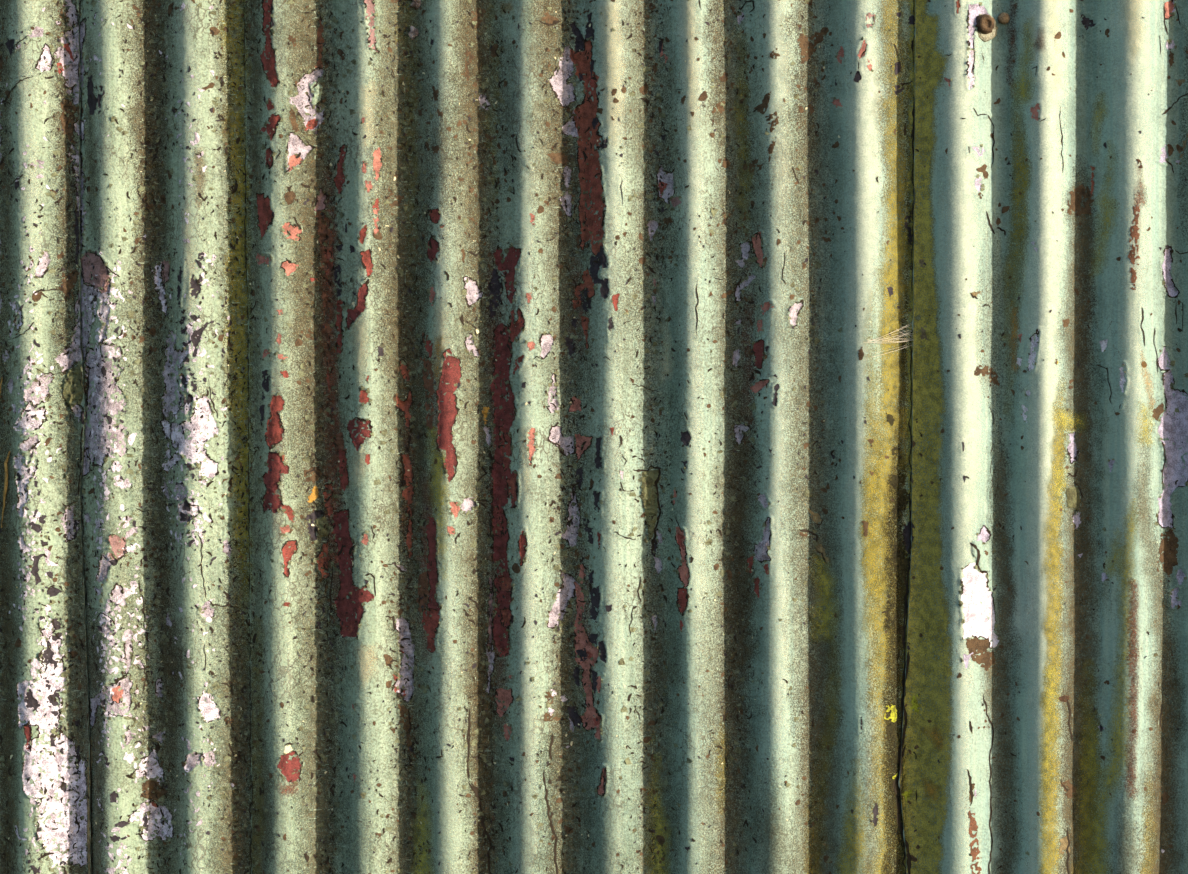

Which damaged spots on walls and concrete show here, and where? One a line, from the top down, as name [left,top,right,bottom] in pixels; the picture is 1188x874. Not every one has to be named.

corrosion [257,194,302,241]
peeling [237,72,442,371]
corrosion [569,40,605,255]
peeling [0,0,392,874]
corrosion [262,333,297,577]
corrosion [307,145,382,652]
peeling [351,380,461,493]
corrosion [396,332,461,652]
corrosion [482,247,536,742]
peeling [958,563,1000,668]
peeling [976,527,1001,561]
peeling [1154,347,1188,530]